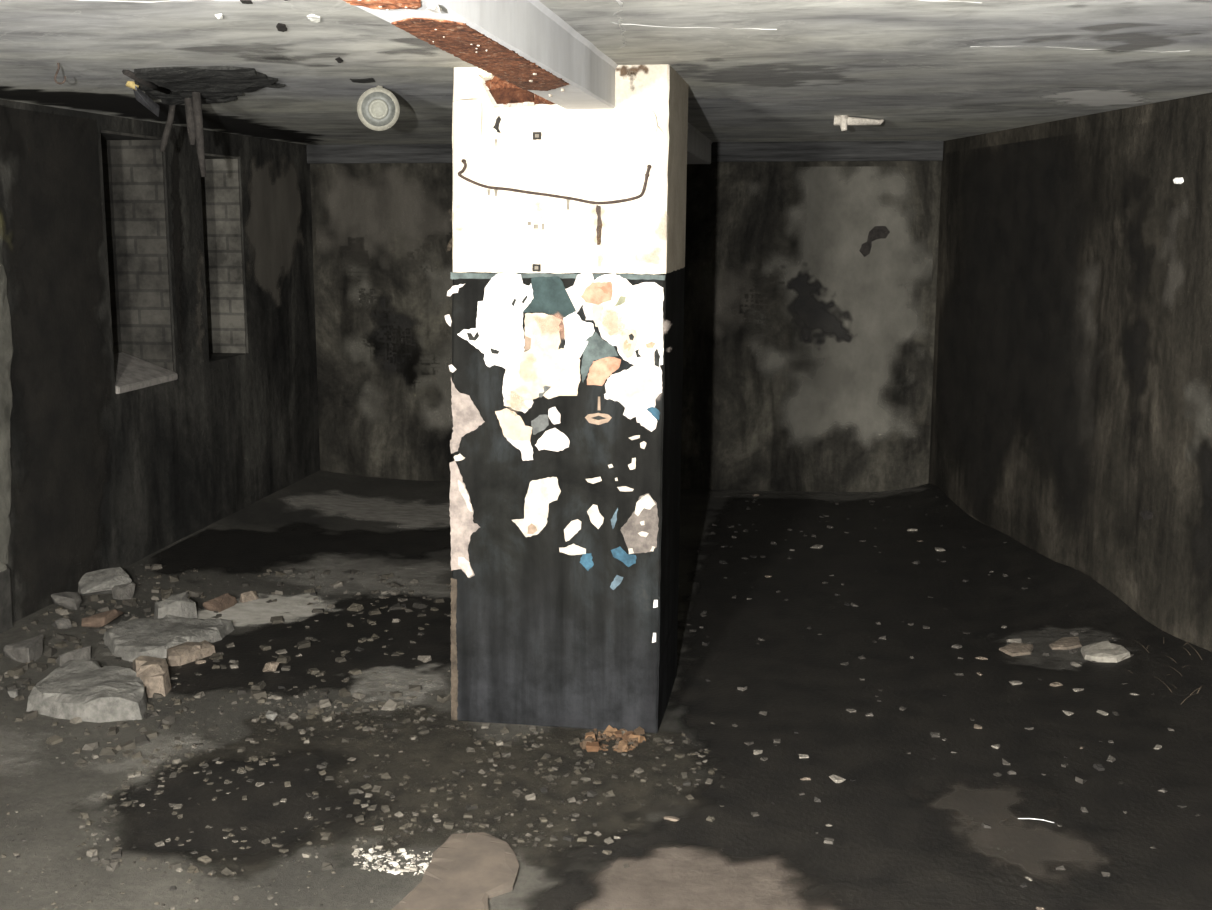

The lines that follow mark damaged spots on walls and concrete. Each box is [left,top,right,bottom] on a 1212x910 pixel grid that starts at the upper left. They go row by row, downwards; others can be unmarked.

crack [614,0,702,48]
crack [1043,46,1183,54]
peeling [445,271,664,578]